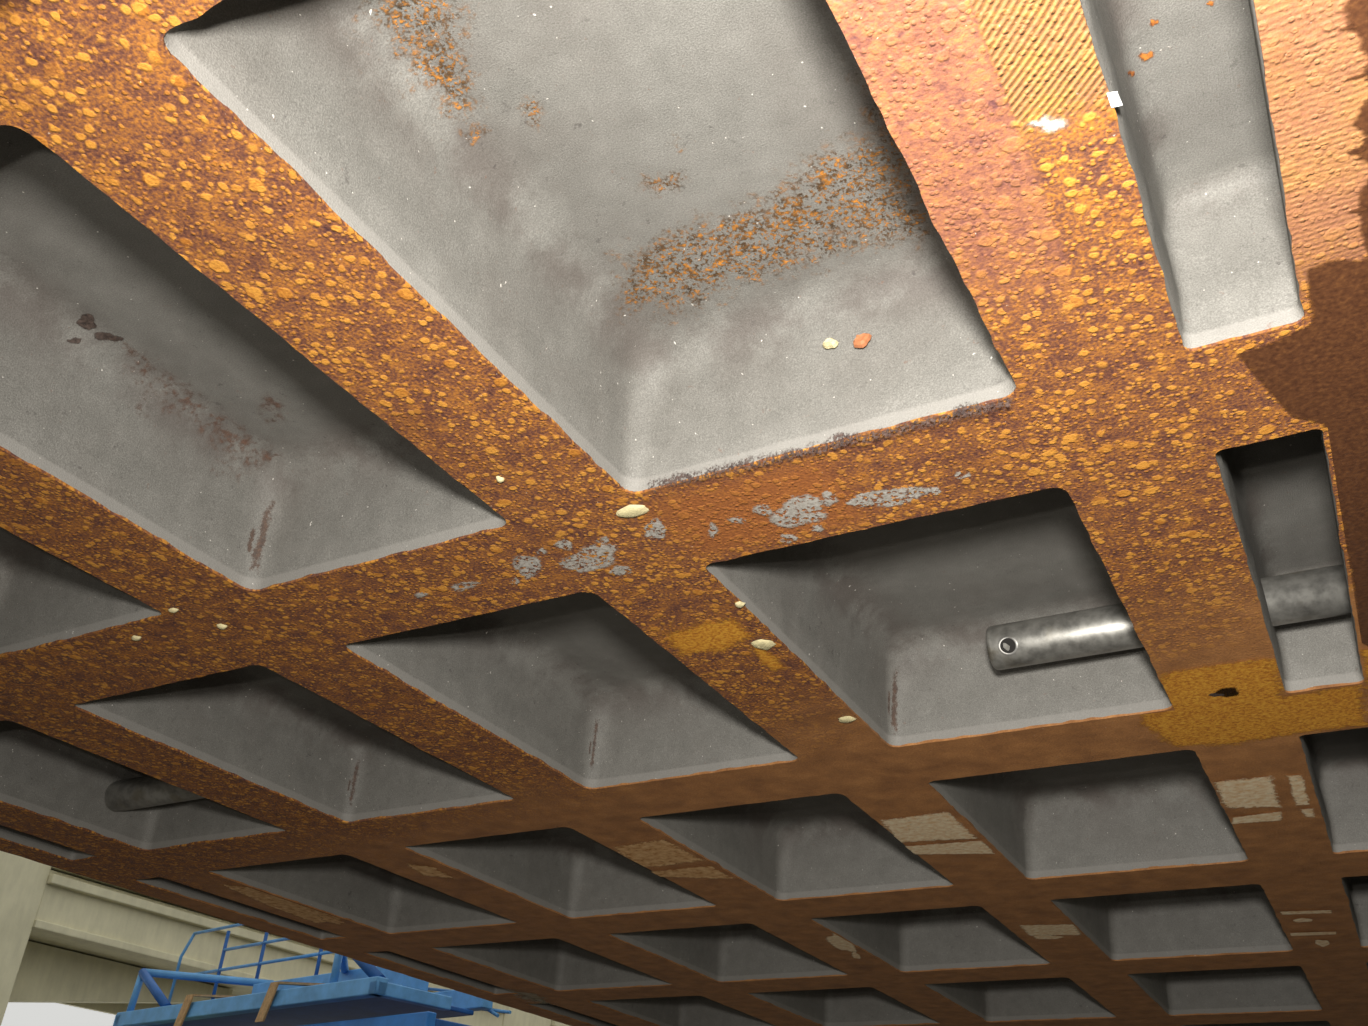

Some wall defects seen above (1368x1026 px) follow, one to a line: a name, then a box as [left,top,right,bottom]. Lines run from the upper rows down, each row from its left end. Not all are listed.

rust [376,0,471,116]
rust [617,107,928,314]
peeling [644,518,666,538]
peeling [709,486,941,543]
peeling [512,536,631,584]
rust [1142,649,1368,747]
peeling [1232,811,1282,824]